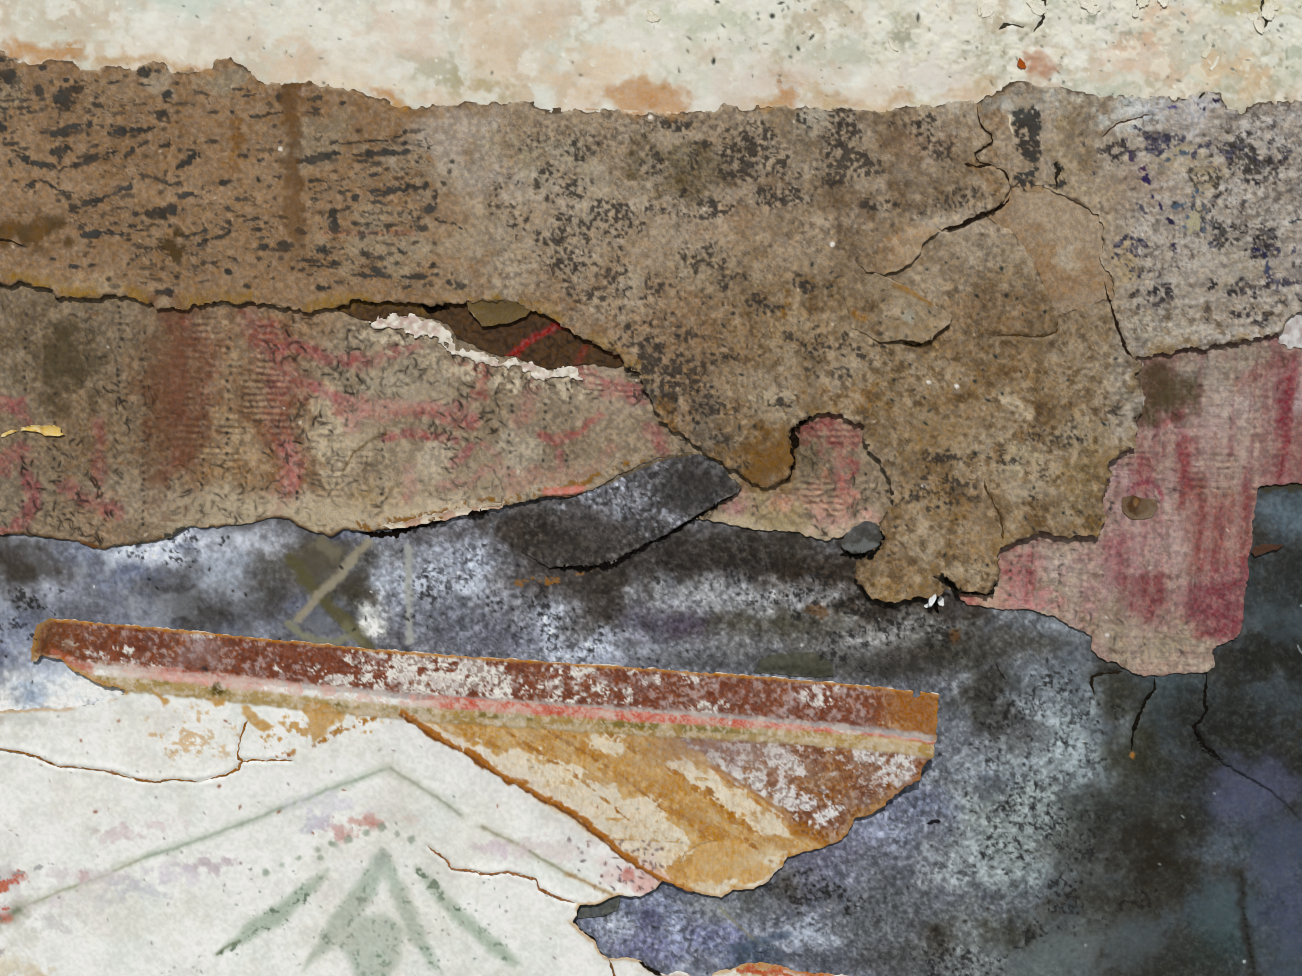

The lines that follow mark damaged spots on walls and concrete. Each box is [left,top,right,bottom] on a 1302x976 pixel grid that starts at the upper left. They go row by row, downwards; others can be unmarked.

crack [940,106,1012,231]
spalling [369,313,583,381]
crack [1104,283,1132,357]
peeling [383,501,505,529]
peeling [521,452,742,568]
leakage [902,449,1021,512]
leakage [478,586,576,649]
leakage [724,546,955,672]
crack [0,721,292,783]
leakage [924,666,1123,976]
crack [427,845,661,976]
peeling [577,895,620,918]